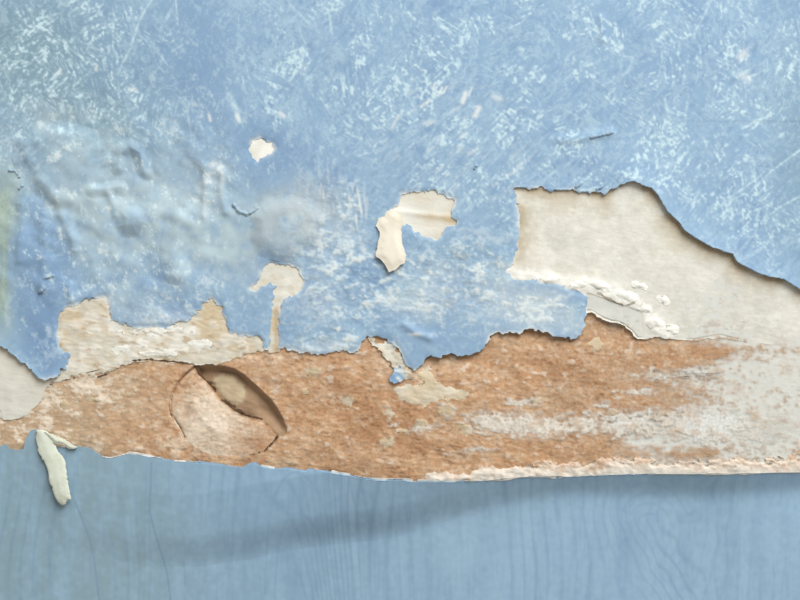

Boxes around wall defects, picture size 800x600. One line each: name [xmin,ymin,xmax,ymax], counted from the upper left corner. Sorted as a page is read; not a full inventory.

peeling [249,138,274,162]
spalling [0,181,800,481]
crack [132,358,262,437]